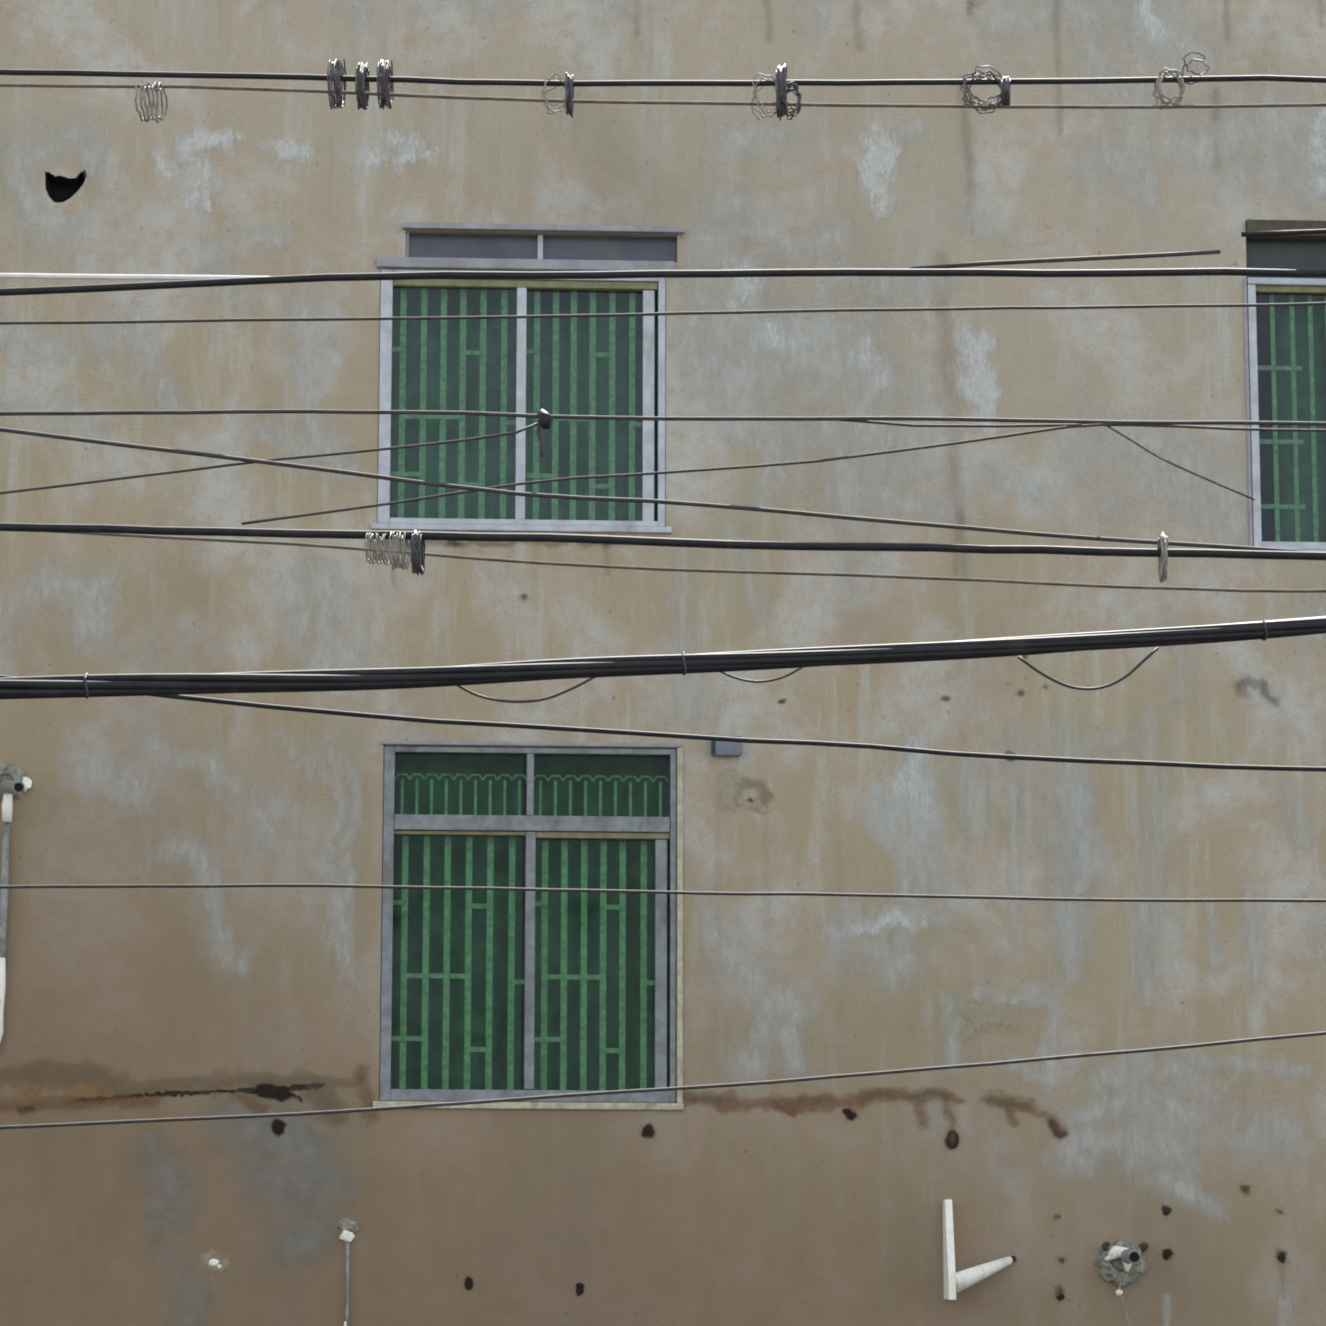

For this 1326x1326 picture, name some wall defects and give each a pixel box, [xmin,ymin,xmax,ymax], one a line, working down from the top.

spalling [45,170,87,207]
rust [255,1084,291,1101]
rust [1049,1119,1067,1138]
rust [945,1130,959,1149]